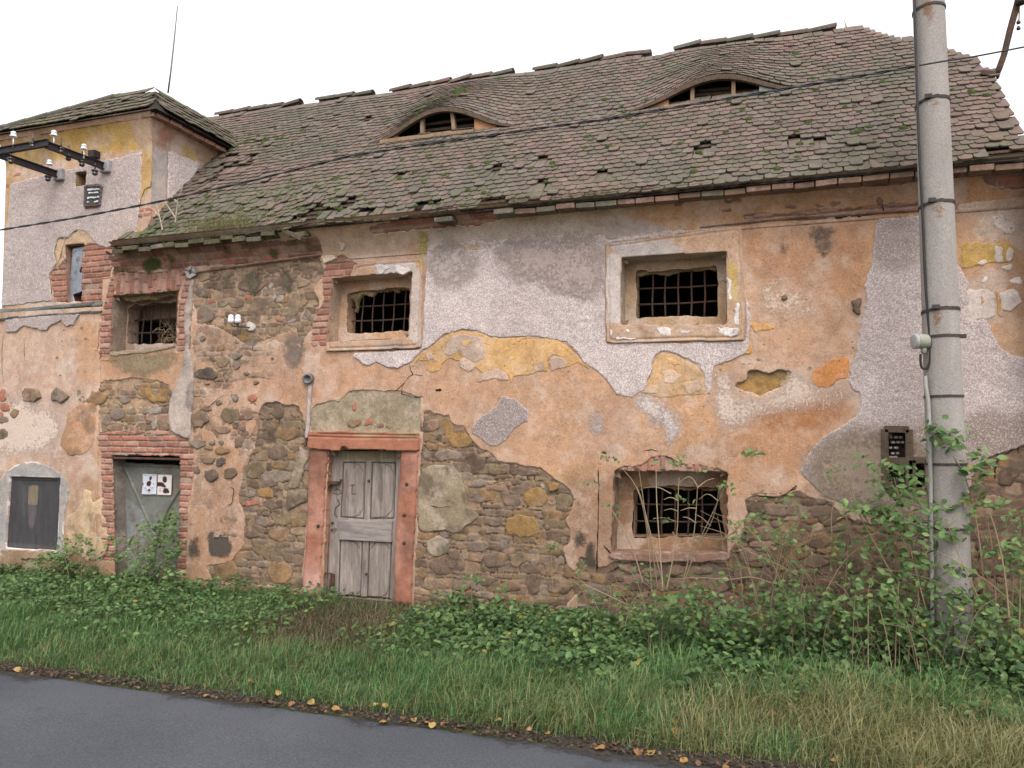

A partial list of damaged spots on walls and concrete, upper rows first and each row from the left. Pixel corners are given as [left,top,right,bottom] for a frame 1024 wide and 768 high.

flaking render [50,237,357,357]
flaking render [194,367,218,380]
peeling [411,331,590,391]
flaking render [637,266,849,398]
mould [811,226,833,255]
peeling [961,214,1022,321]
flaking render [22,374,219,586]
flaking render [207,390,930,630]